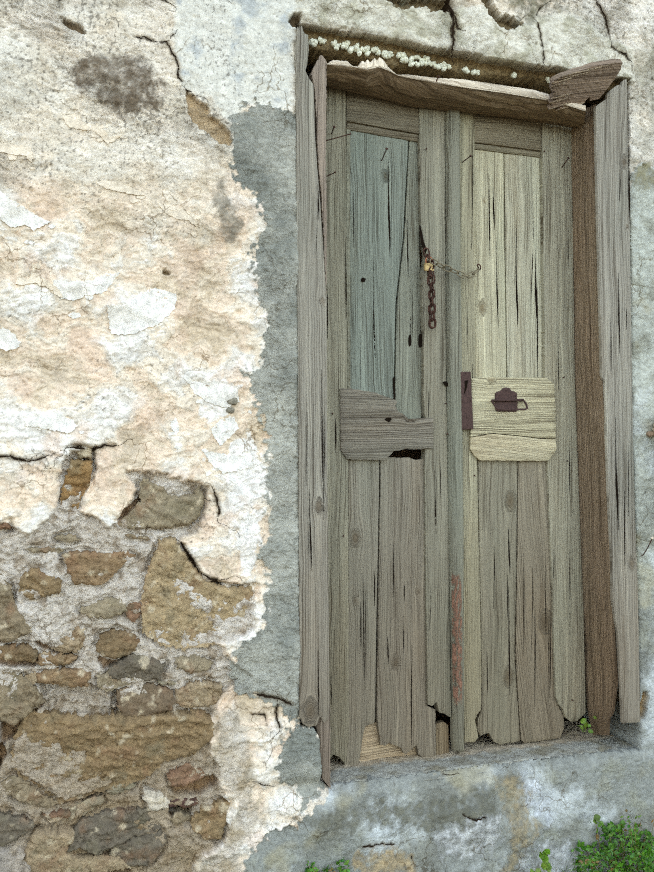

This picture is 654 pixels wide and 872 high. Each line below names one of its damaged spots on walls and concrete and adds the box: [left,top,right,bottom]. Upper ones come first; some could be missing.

crack [110,18,208,109]
crack [441,0,466,65]
crack [505,1,550,68]
crack [577,0,633,68]
crack [0,439,128,470]